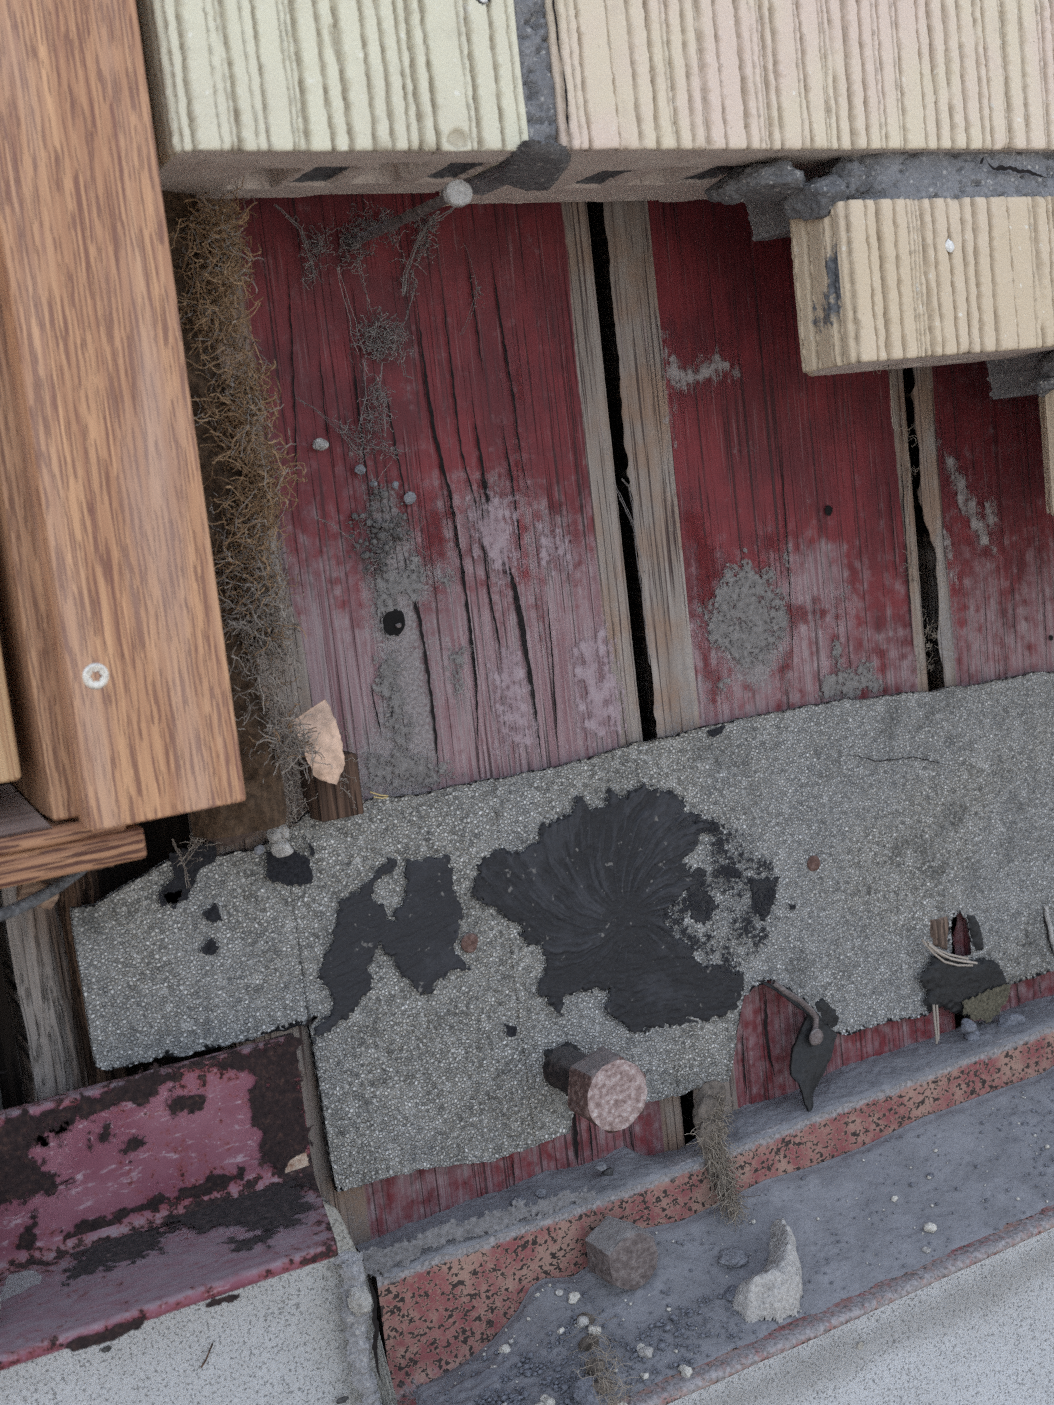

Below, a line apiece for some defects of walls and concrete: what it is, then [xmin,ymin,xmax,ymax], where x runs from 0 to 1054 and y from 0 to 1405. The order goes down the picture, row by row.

peeling [364,648,466,794]
rust [0,1061,208,1252]
rust [60,1035,319,1291]
rust [58,1317,147,1352]
rust [204,1294,241,1308]